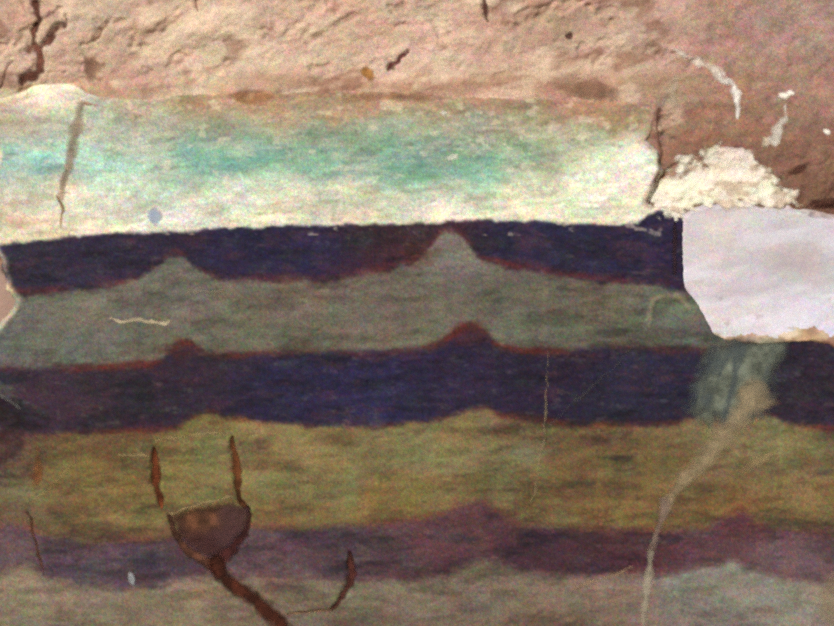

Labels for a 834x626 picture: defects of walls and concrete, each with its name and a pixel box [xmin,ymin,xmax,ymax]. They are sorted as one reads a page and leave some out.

crack [0,0,67,88]
crack [56,102,83,224]
spalling [810,198,834,208]
spalling [713,326,834,347]
damp [642,340,783,625]